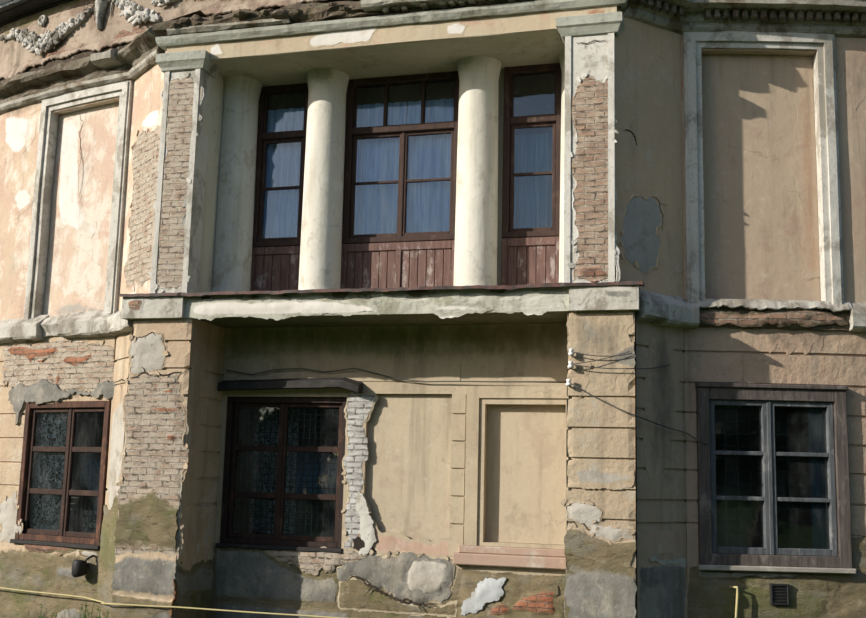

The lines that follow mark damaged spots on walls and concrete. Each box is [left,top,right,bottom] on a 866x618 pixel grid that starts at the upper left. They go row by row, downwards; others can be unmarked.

flaking render [122,73,204,314]
flaking render [567,73,637,302]
peeling [191,298,382,321]
peeling [427,302,566,319]
flaking render [2,337,115,398]
flaking render [107,330,199,556]
peeling [567,461,635,490]
spalling [264,491,453,596]
flaking render [560,499,636,545]
flaking render [461,577,559,617]
flaking render [637,562,687,618]